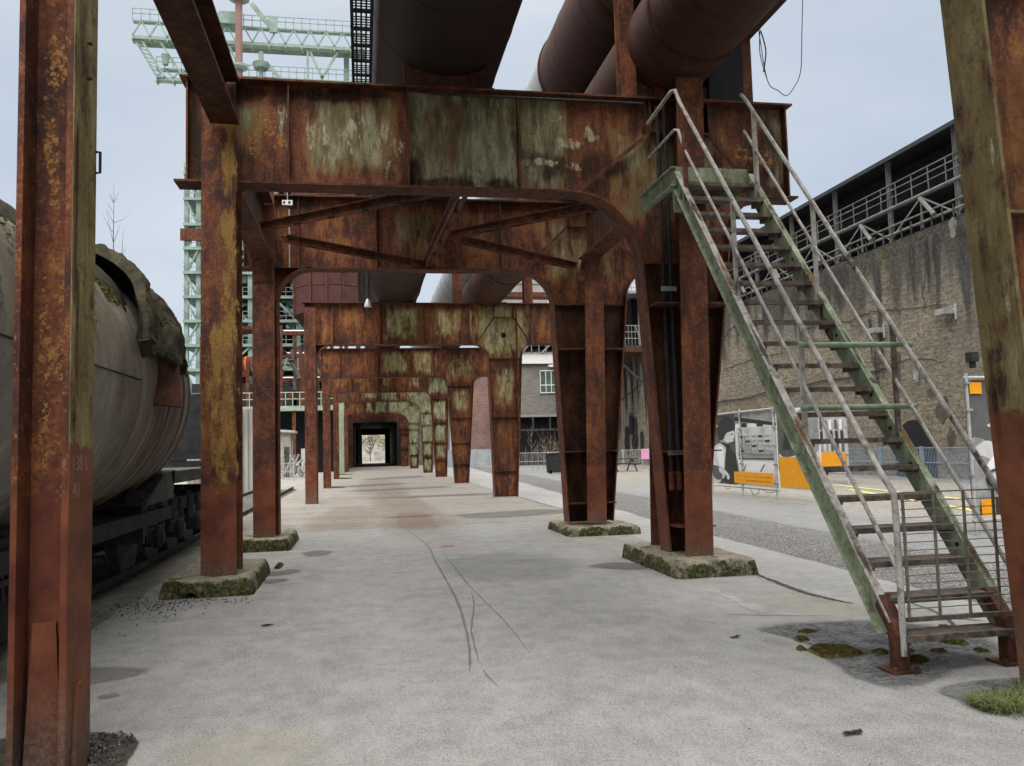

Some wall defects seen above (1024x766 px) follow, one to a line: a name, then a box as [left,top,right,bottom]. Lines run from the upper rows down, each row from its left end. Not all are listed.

rust [290,89,388,102]
rust [748,124,775,181]
rust [400,160,473,187]
rust [531,155,566,180]
rust [957,526,989,576]